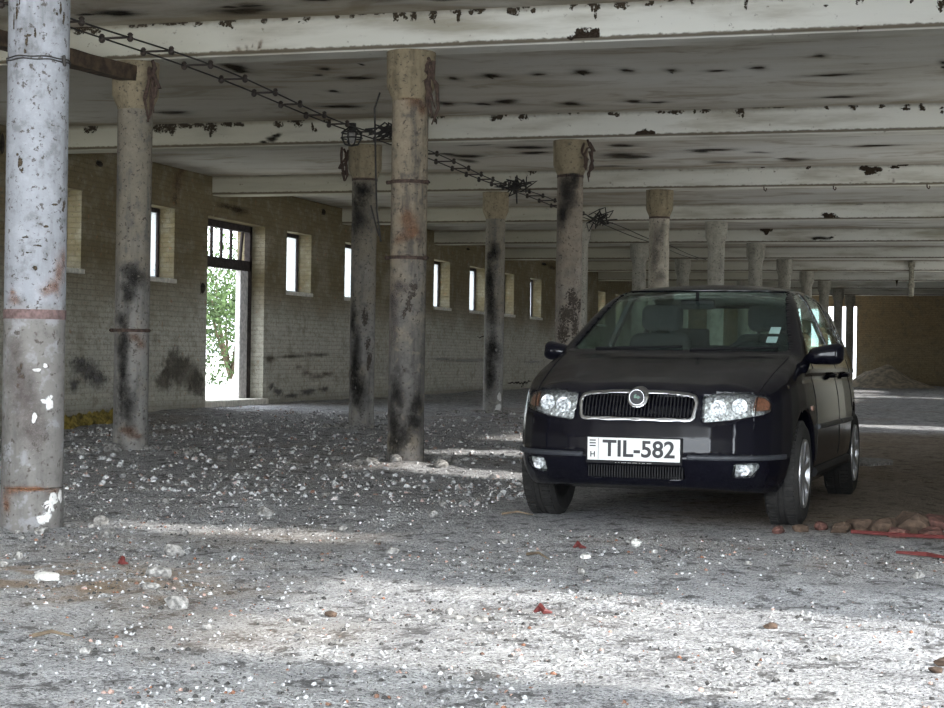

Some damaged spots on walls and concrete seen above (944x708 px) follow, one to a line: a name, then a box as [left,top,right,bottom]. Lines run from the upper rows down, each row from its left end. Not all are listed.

leakage [223,5,264,14]
peeling [450,9,486,22]
peeling [507,7,536,16]
spalling [567,3,601,41]
leakage [600,145,646,167]
spalling [859,164,908,175]
leakage [559,173,579,223]
leakage [122,267,144,303]
leakage [118,313,133,428]
flaking render [32,395,53,423]
leakage [390,385,422,449]
flaking render [36,490,62,525]